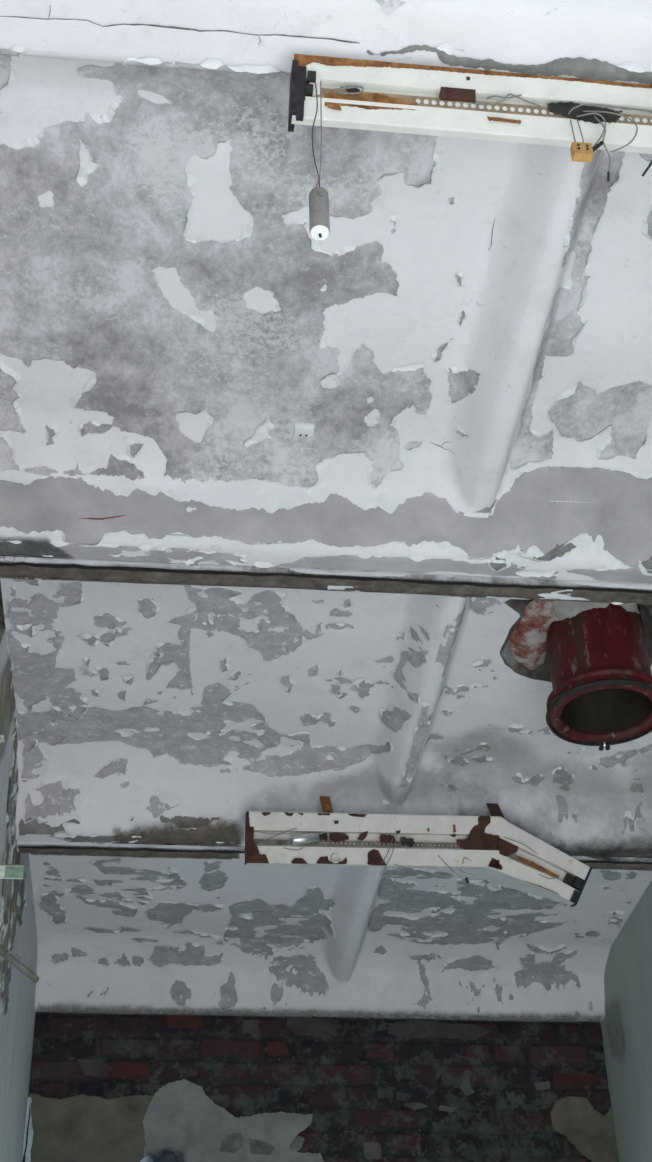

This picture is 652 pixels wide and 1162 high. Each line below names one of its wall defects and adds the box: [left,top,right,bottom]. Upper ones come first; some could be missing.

peeling [0,45,27,96]
corrosion [294,54,652,89]
corrosion [324,93,417,111]
corrosion [487,116,521,124]
peeling [0,57,652,864]
leakage [0,538,652,605]
corrosion [329,833,349,843]
corrosion [380,834,415,847]
corrosion [453,825,559,895]
flaking render [0,831,640,1162]